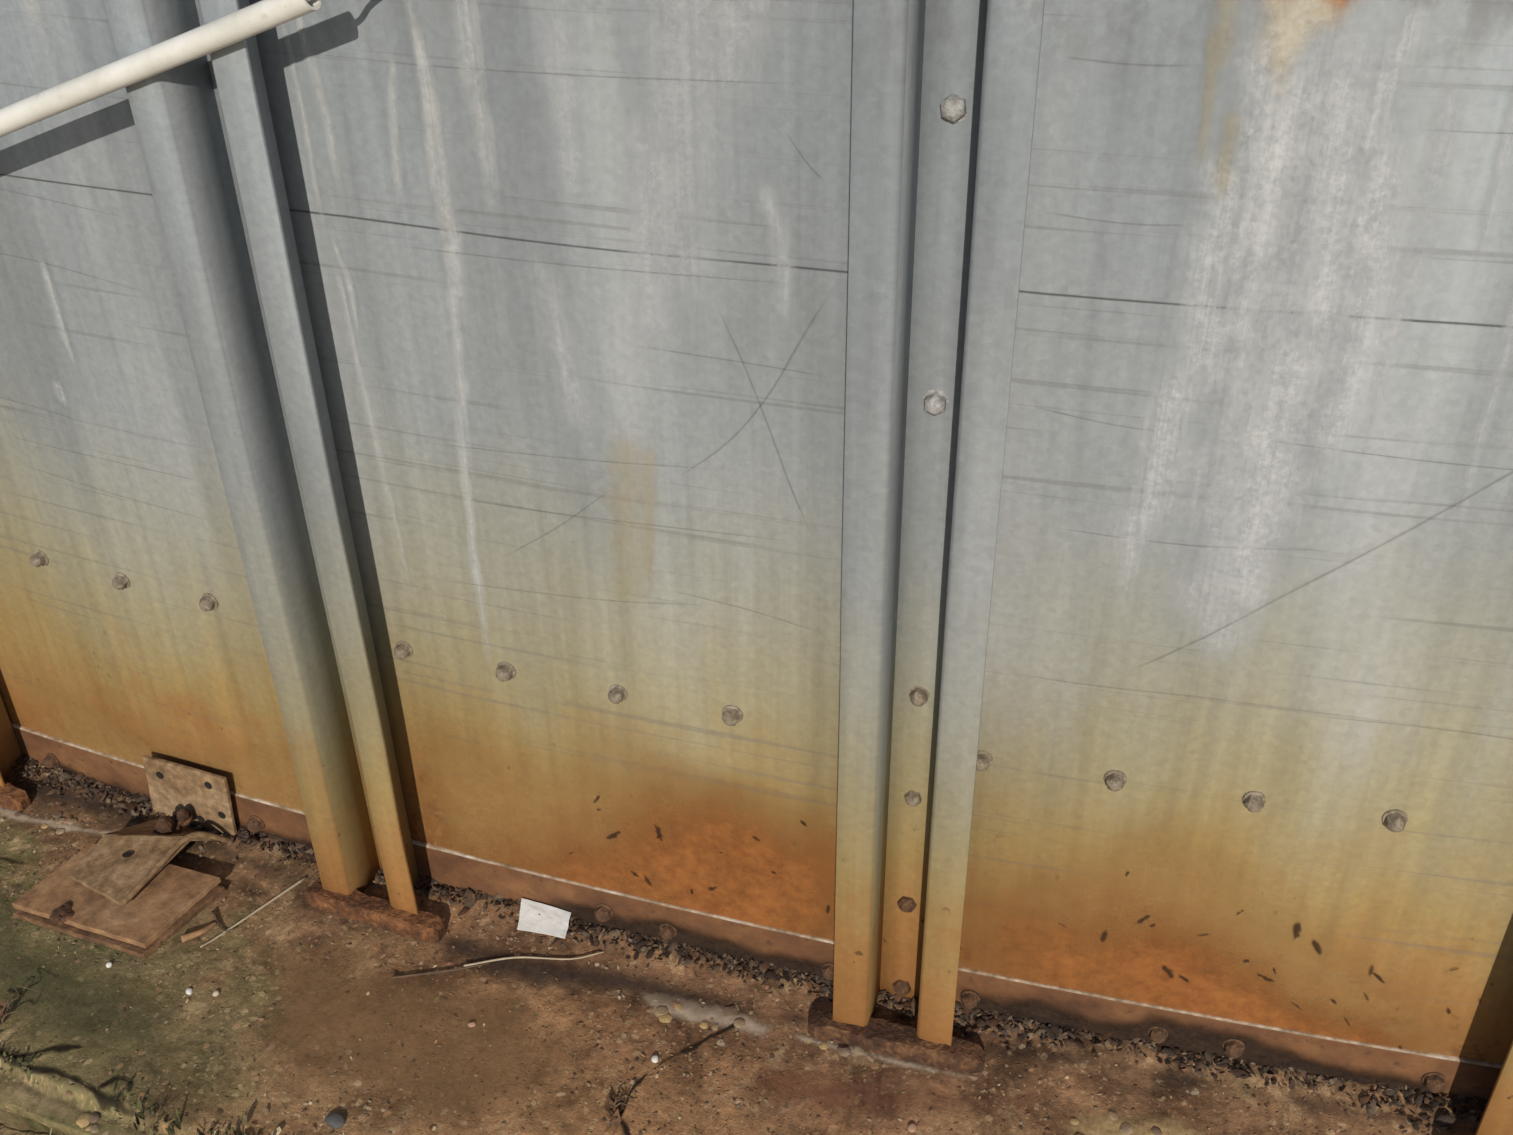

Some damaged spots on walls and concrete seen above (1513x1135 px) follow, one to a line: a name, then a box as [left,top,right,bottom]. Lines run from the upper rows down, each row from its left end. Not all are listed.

rust [1271,0,1343,59]
water stain [1190,14,1386,641]
rust [0,783,31,811]
rust [443,763,829,936]
rust [994,851,1413,1049]
rust [808,1011,986,1074]